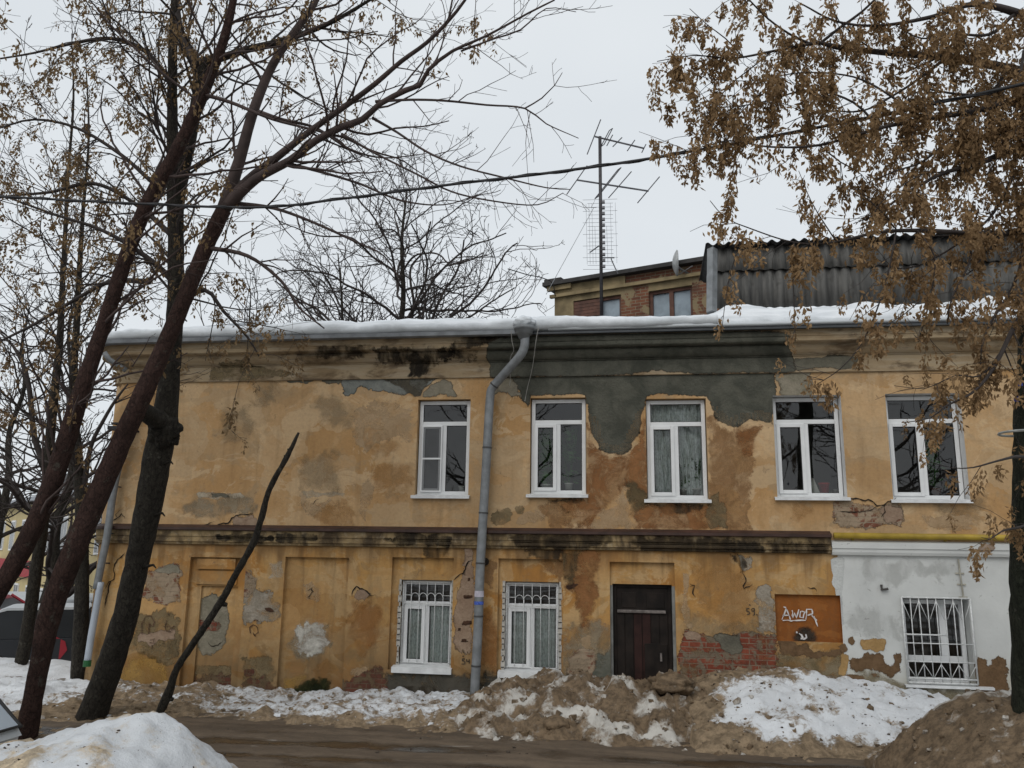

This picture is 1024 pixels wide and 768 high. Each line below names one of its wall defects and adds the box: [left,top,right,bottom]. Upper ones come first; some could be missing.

damp [317,336,505,377]
flaking render [287,379,457,397]
flaking render [486,330,858,455]
peeling [183,492,257,517]
flaking render [832,500,905,530]
flaking render [452,549,475,655]
peeling [121,562,183,684]
flaking render [194,566,306,690]
peeling [291,621,332,659]
flaking render [677,584,902,680]
peeling [974,655,1010,692]